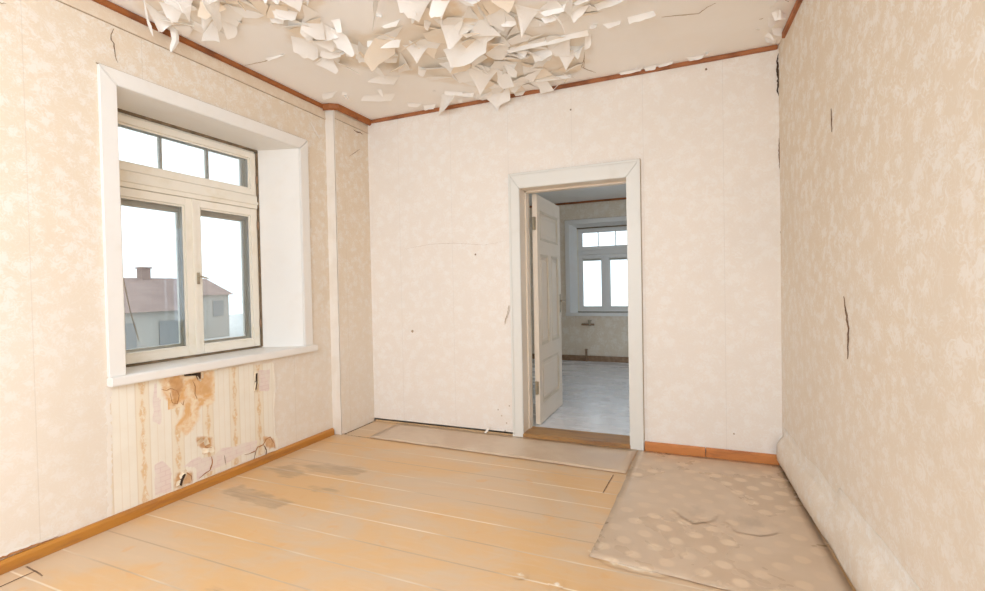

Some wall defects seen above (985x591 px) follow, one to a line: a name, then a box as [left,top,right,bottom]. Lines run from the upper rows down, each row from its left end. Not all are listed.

peeling [124,0,656,114]
peeling [619,58,673,75]
spalling [194,433,217,459]
spalling [175,469,188,489]